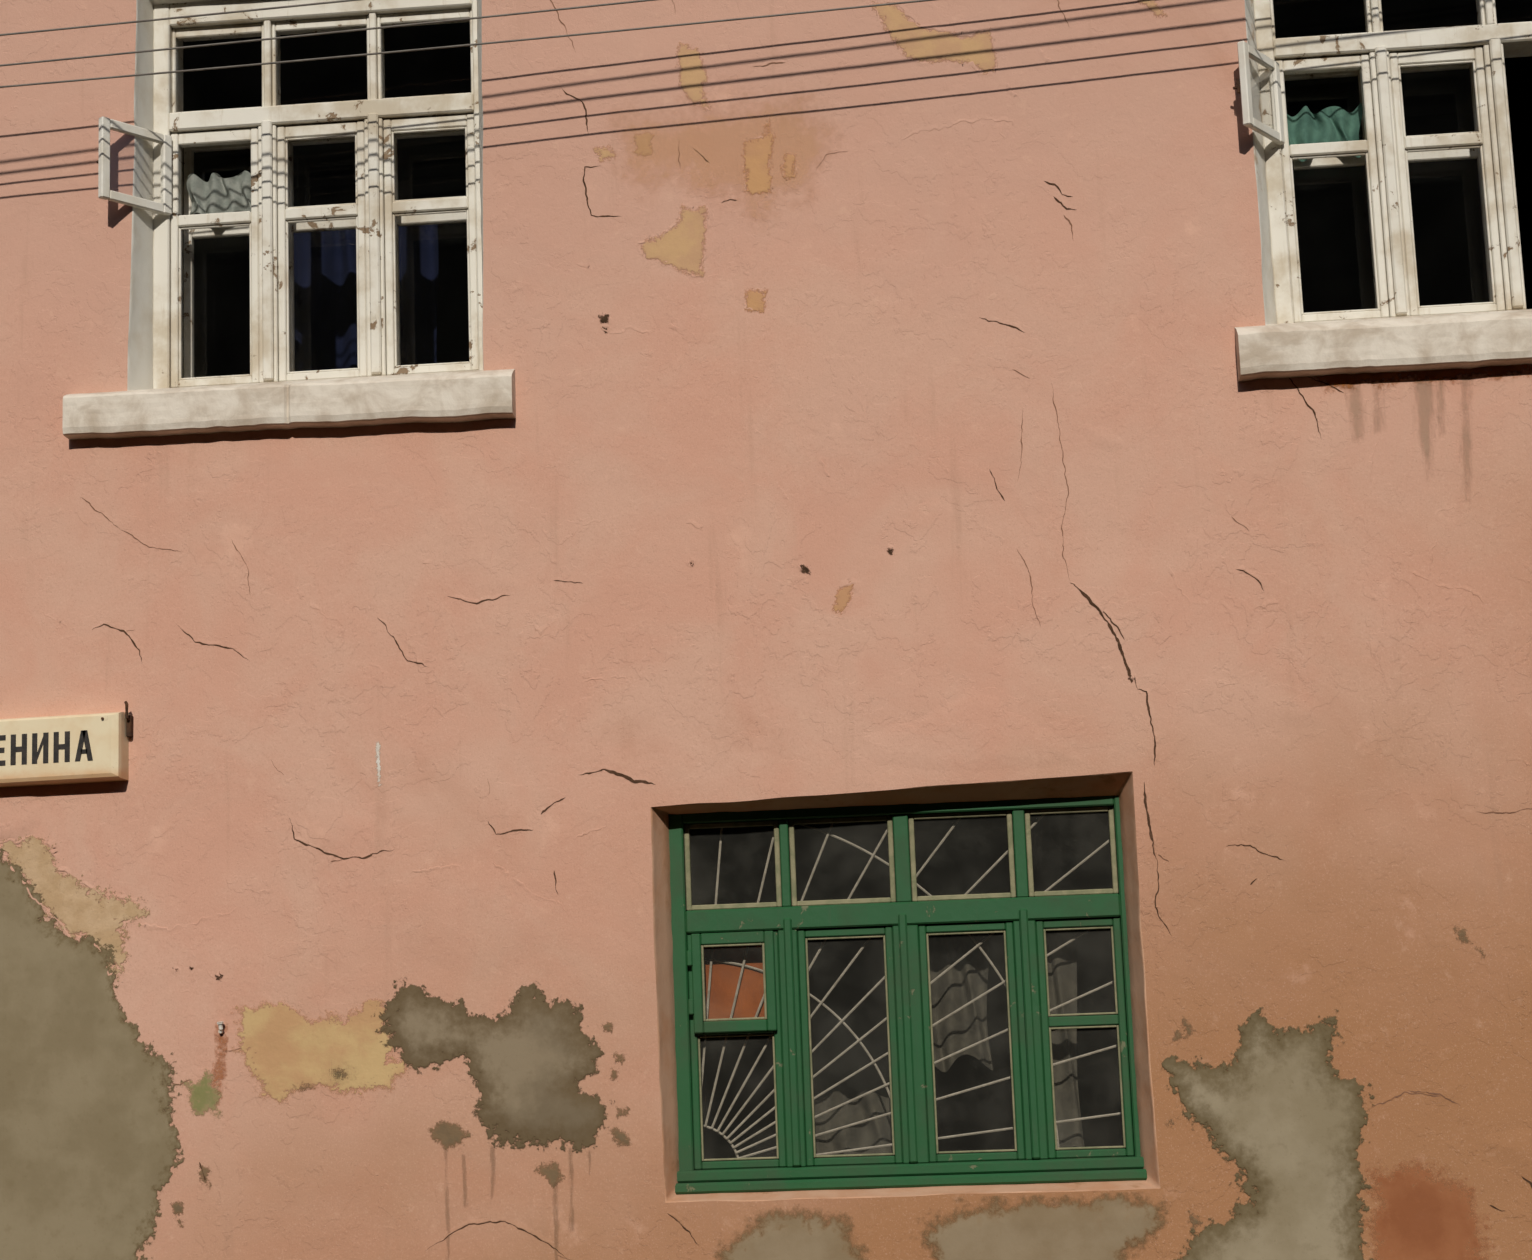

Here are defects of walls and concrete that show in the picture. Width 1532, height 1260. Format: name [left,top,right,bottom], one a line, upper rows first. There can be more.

peeling [675,42,716,113]
peeling [869,0,999,78]
peeling [739,119,800,198]
peeling [636,202,711,278]
crack [979,316,1025,333]
crack [990,369,1172,936]
peeling [0,835,153,981]
peeling [235,999,406,1102]